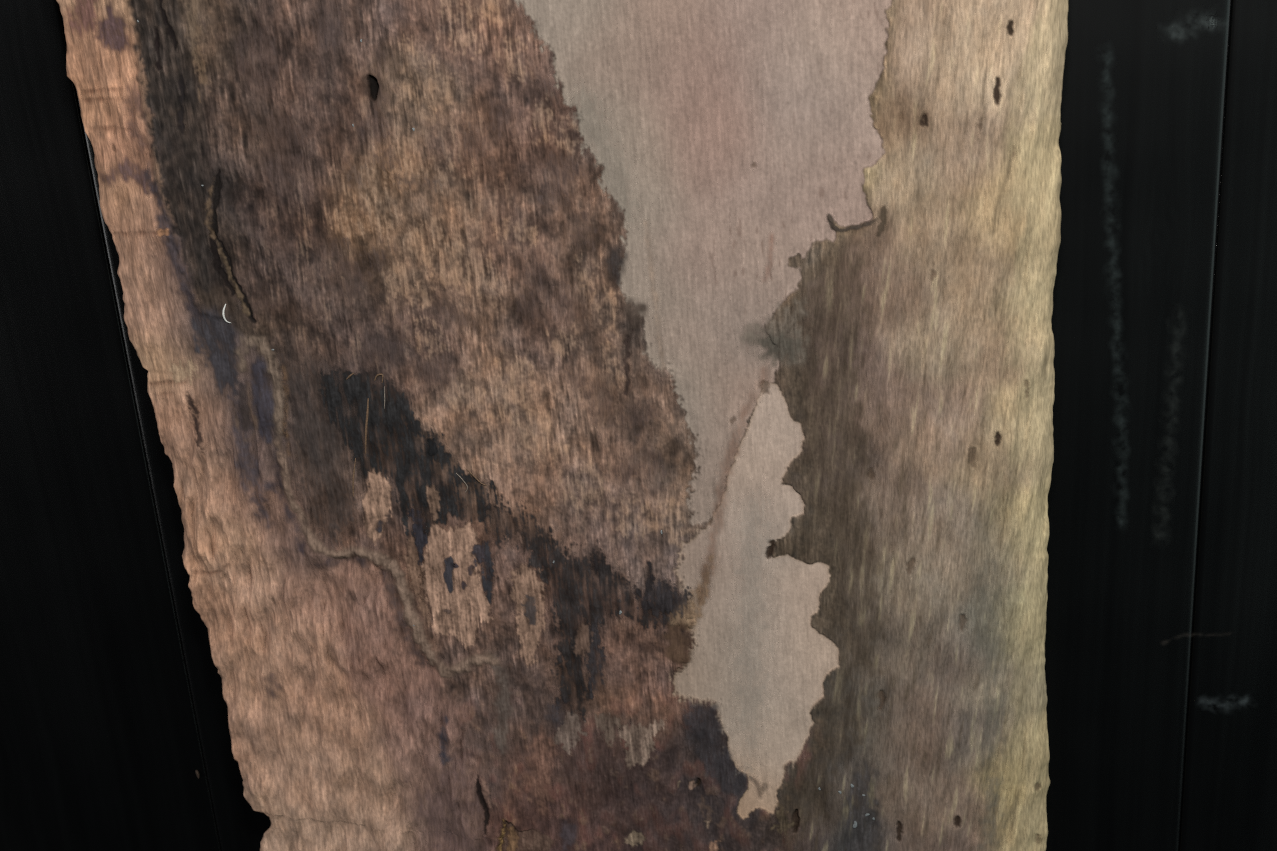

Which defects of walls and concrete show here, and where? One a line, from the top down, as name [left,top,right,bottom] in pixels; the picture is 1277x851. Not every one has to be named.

crack [201,169,256,326]
water stain [102,158,712,750]
peeling [515,0,892,819]